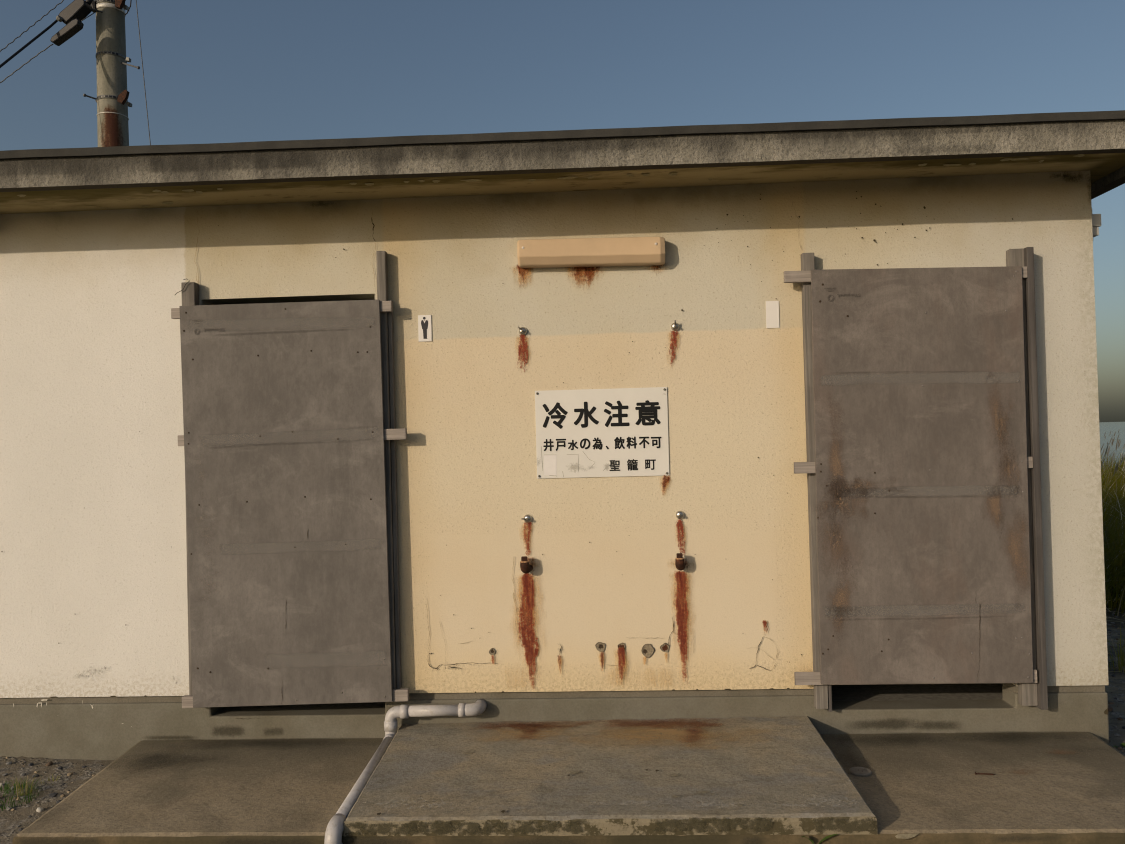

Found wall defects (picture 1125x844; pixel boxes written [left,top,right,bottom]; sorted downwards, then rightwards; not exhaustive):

corrosion [567,267,600,282]
corrosion [518,335,528,372]
corrosion [669,331,679,364]
corrosion [517,522,539,688]
corrosion [665,519,689,678]
corrosion [617,647,625,680]
crack [750,631,778,671]